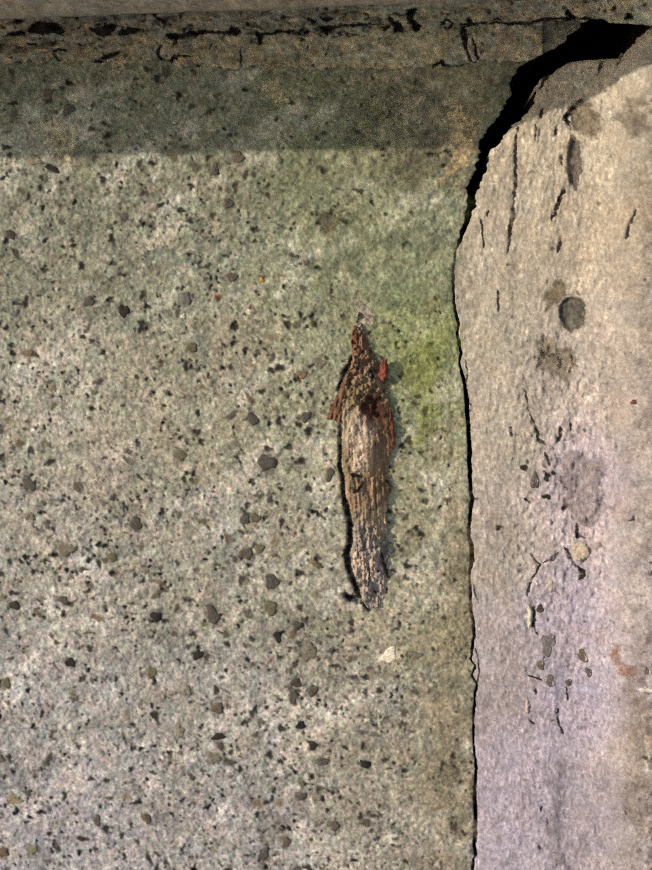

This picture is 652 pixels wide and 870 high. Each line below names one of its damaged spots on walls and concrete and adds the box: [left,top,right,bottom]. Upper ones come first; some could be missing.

crack [91,6,421,64]
crack [427,149,453,167]
leakage [354,296,374,325]
crack [338,357,353,390]
crack [432,10,651,870]
crack [310,425,370,611]